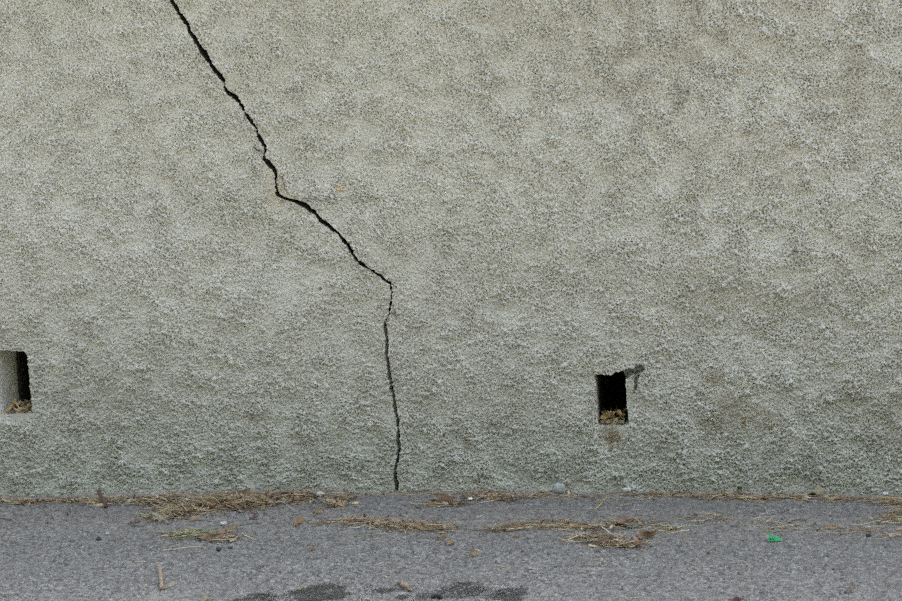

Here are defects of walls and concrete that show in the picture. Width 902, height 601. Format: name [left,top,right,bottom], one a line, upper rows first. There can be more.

crack [170,0,409,490]